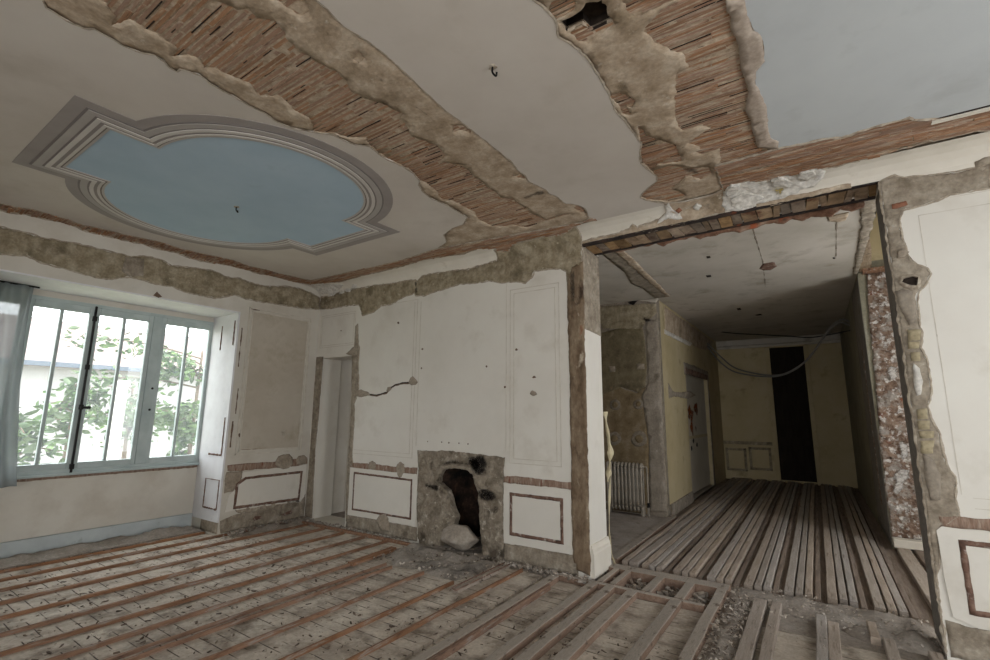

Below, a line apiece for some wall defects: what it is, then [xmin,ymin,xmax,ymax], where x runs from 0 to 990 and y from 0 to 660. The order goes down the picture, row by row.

flaking render [0,0,670,576]
crack [352,376,418,397]
flaking render [532,0,990,244]
flaking render [827,156,990,660]